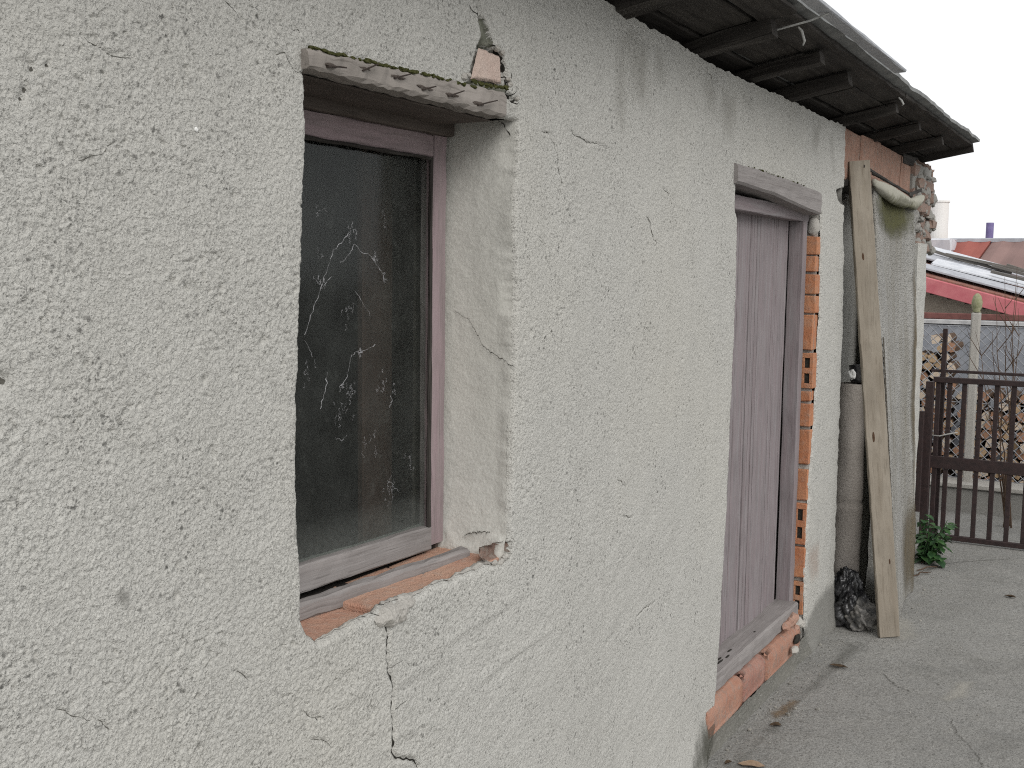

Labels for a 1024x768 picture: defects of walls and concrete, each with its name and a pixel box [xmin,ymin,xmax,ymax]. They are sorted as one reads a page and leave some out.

spalling [461,19,520,101]
spalling [479,542,510,566]
crack [371,613,418,768]